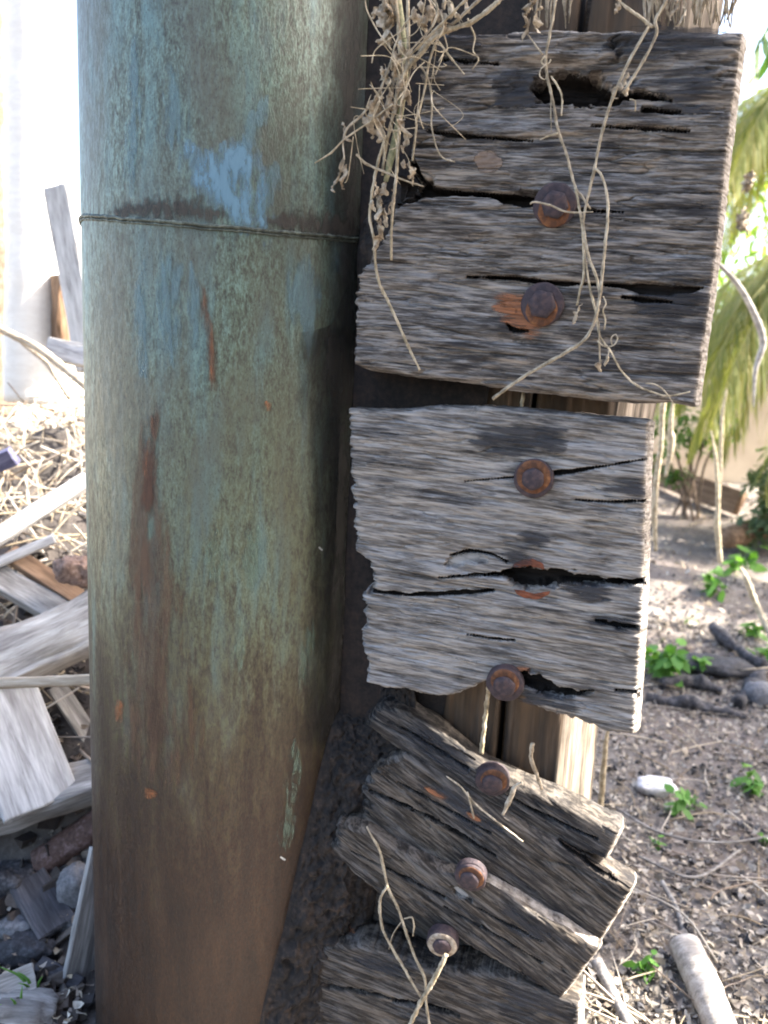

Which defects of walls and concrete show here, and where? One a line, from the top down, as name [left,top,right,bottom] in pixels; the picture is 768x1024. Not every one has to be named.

crack [593,107,690,133]
crack [469,276,702,304]
rust [492,293,558,336]
crack [554,459,646,475]
crack [576,497,645,505]
crack [453,548,508,563]
crack [373,588,495,597]